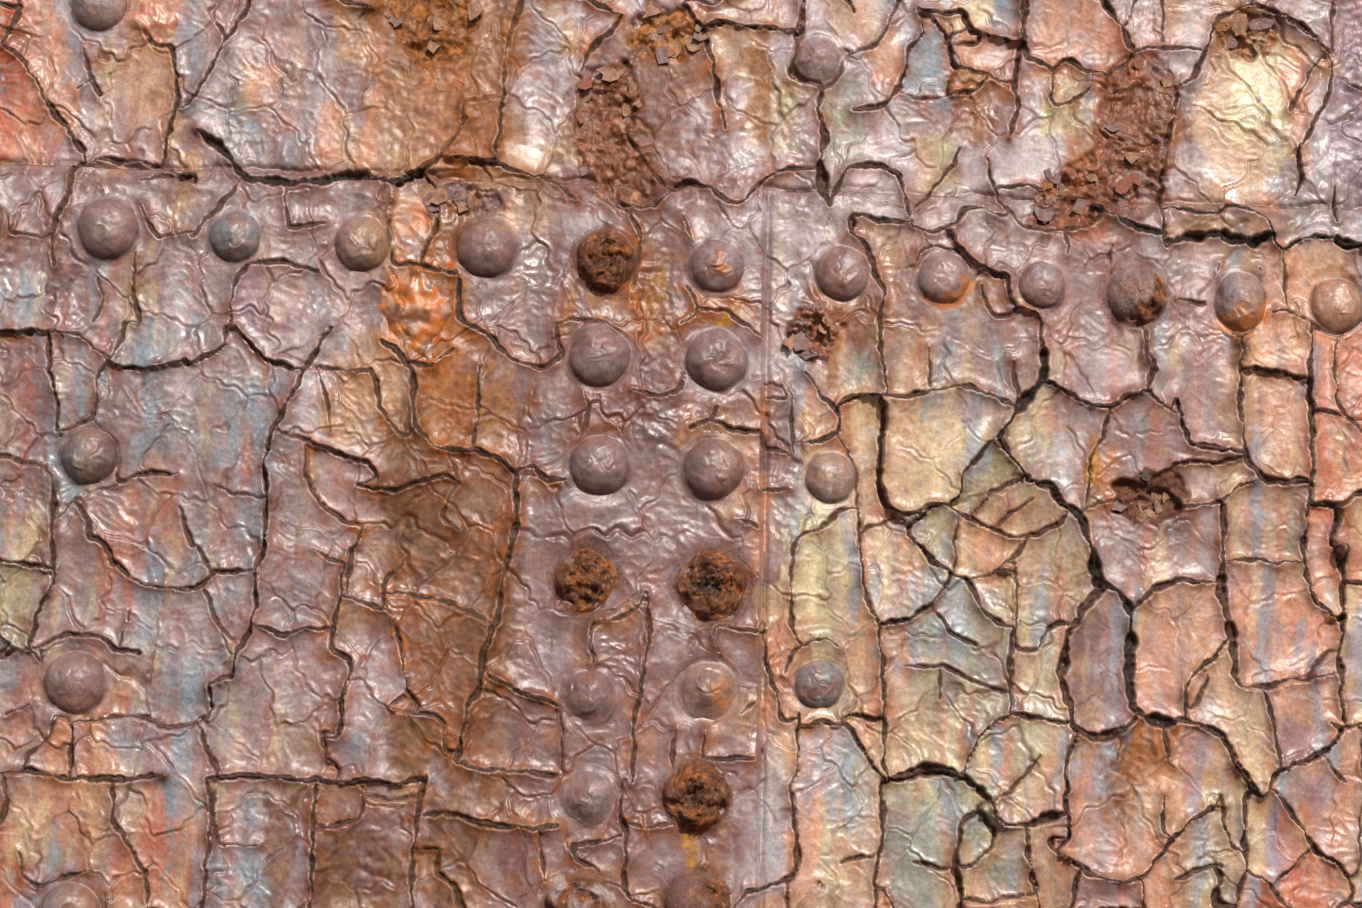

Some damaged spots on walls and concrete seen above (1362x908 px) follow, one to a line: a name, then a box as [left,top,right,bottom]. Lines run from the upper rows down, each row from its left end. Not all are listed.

rust [367,0,511,95]
rust [528,9,693,216]
spalling [575,66,656,210]
spalling [632,0,713,64]
crack [0,0,671,908]
crack [609,0,1362,908]
spalling [1110,467,1186,523]